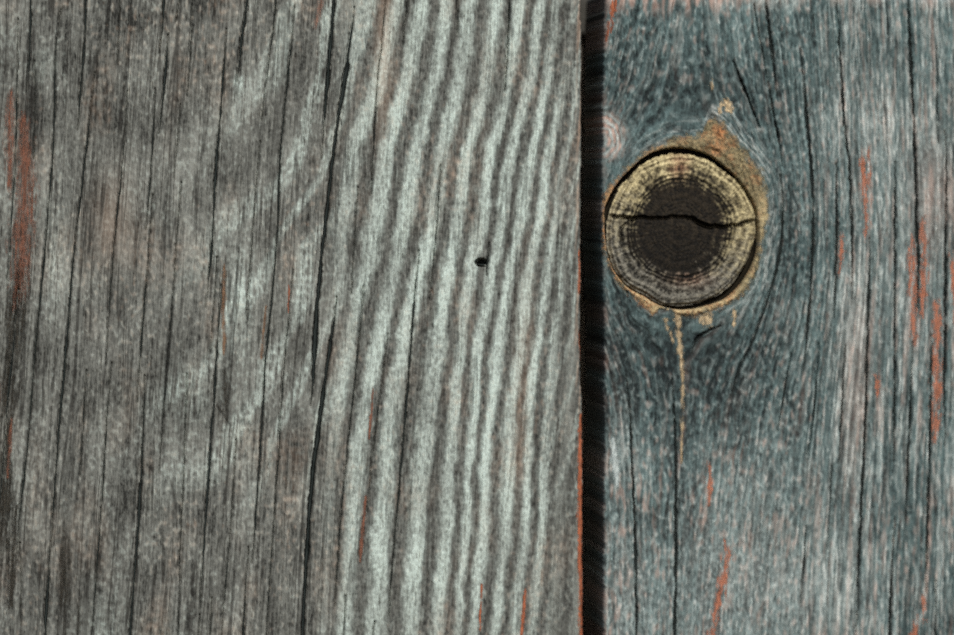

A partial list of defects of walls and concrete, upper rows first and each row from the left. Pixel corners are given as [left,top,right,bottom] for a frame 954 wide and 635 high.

crack [0,0,61,568]
crack [44,0,128,635]
crack [129,0,192,635]
crack [178,0,295,635]
crack [302,0,372,635]
crack [372,1,407,163]
crack [373,166,441,629]
crack [626,375,638,635]
crack [604,0,784,398]